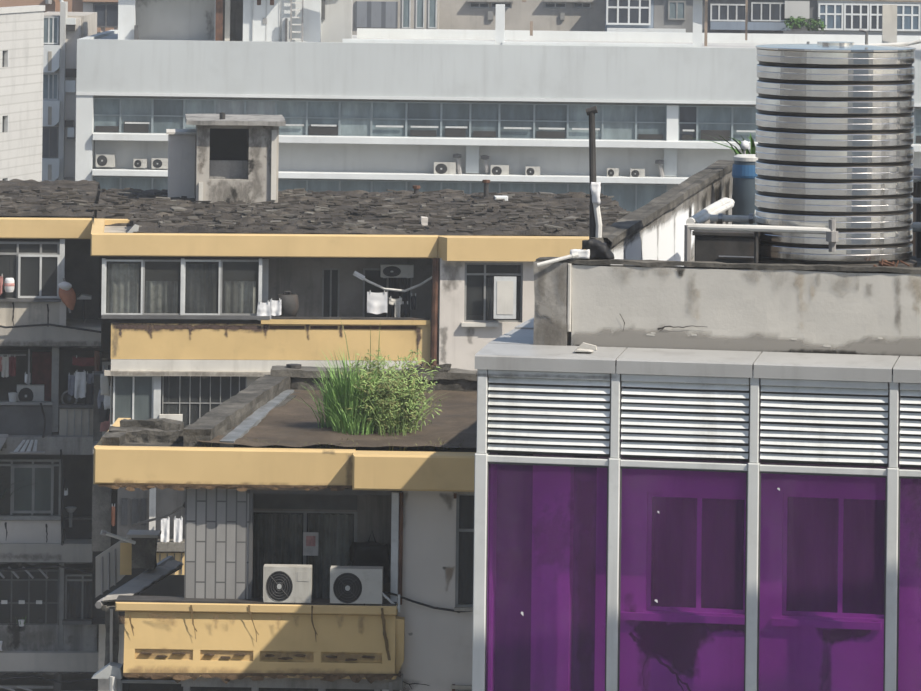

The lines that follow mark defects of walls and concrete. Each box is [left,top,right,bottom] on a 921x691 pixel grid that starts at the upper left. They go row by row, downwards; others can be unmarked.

peeling [114,323,270,338]
crack [629,632,691,691]
damp [634,620,745,677]